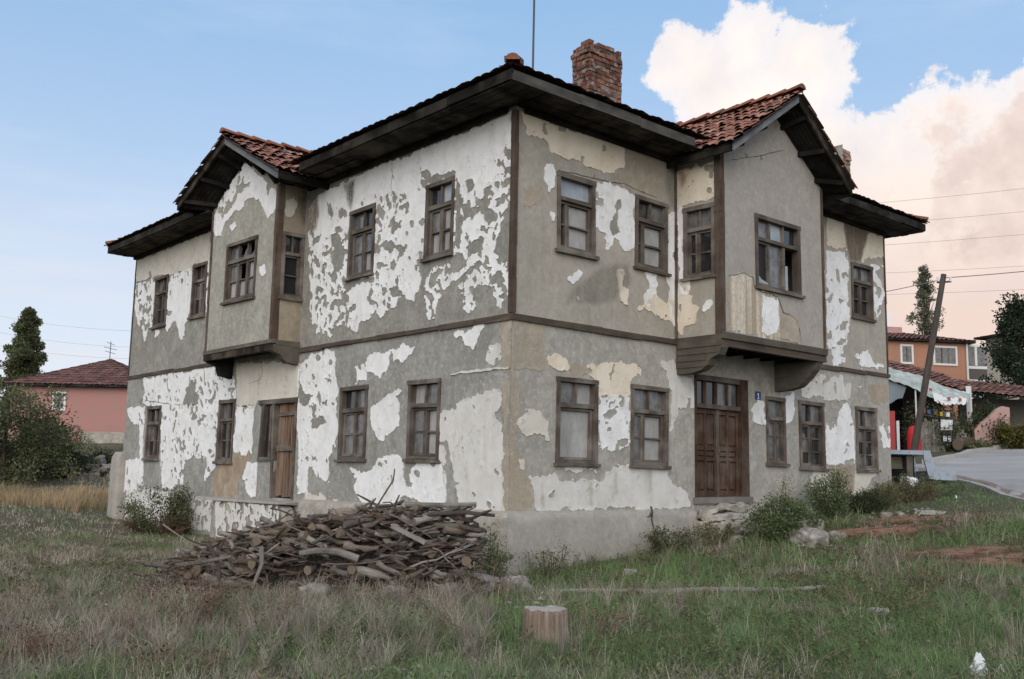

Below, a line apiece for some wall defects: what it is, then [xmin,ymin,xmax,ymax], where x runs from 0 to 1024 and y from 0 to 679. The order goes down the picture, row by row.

peeling [616,160,714,335]
peeling [124,110,642,537]
peeling [762,295,780,336]
peeling [785,217,885,496]
peeling [661,359,694,432]
peeling [751,400,766,426]
peeling [878,423,891,449]
peeling [519,459,691,511]